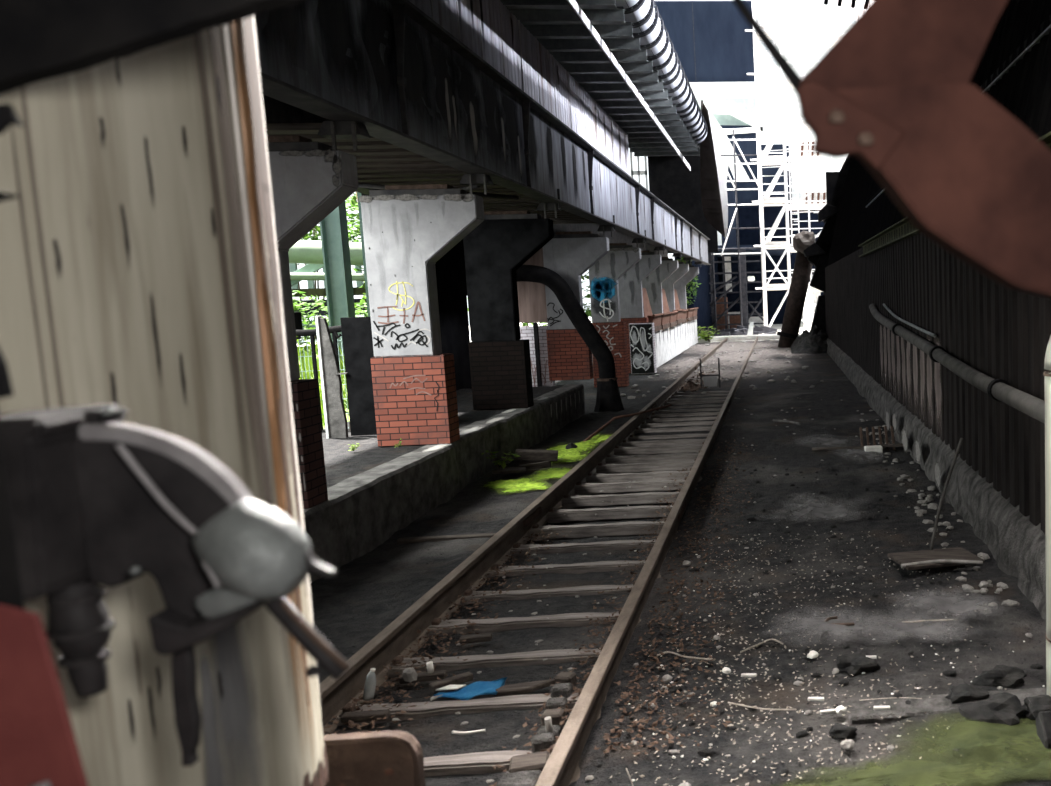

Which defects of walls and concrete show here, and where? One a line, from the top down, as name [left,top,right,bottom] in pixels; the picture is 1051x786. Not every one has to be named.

corrosion [232,16,301,527]
corrosion [286,579,307,615]